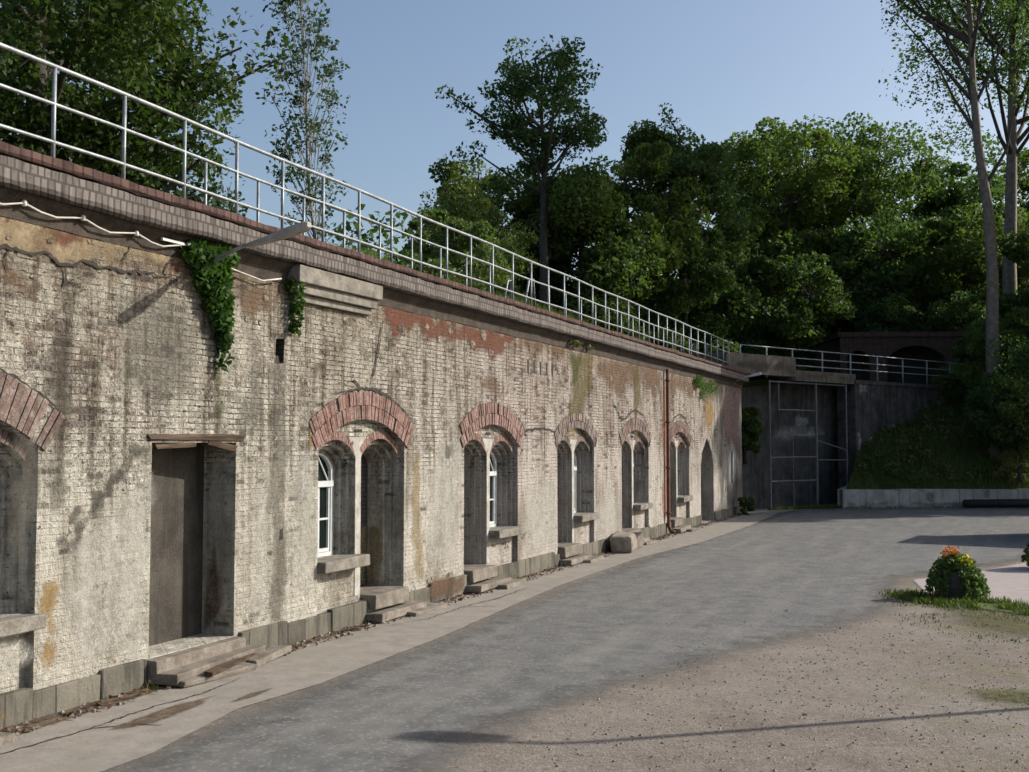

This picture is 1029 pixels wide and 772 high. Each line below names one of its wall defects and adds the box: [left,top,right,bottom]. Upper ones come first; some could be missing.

peeling [0,216,181,275]
crack [0,244,188,290]
peeling [384,306,512,358]
corrosion [41,584,57,664]